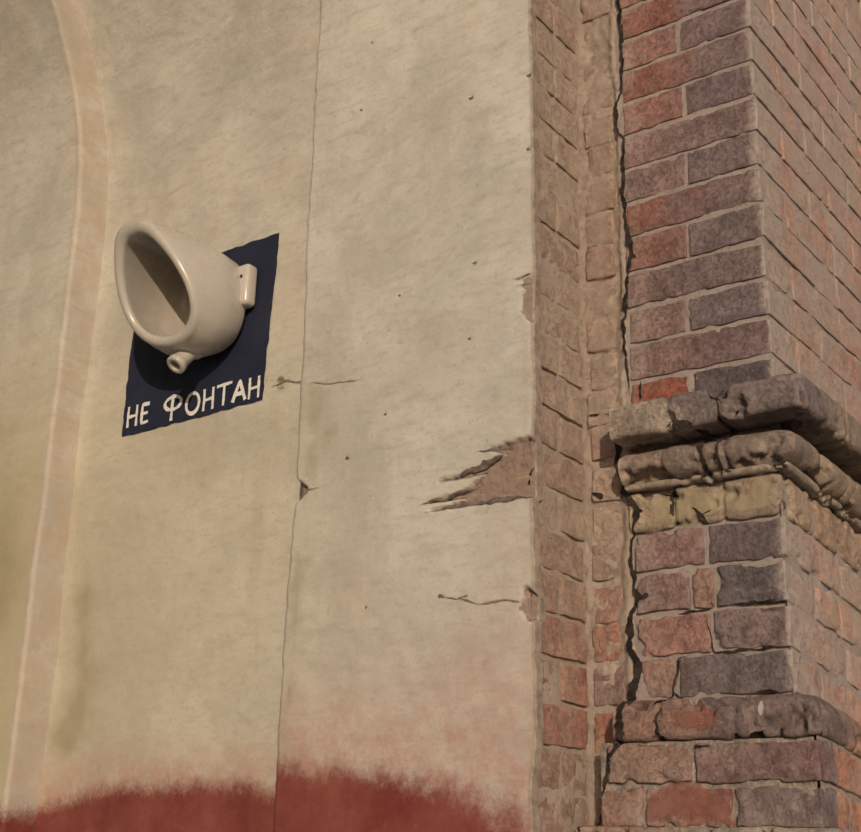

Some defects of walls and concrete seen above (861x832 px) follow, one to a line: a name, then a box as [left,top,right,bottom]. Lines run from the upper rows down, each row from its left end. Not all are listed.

crack [613,0,642,399]
flaking render [418,438,536,513]
crack [668,391,735,477]
crack [443,595,519,604]